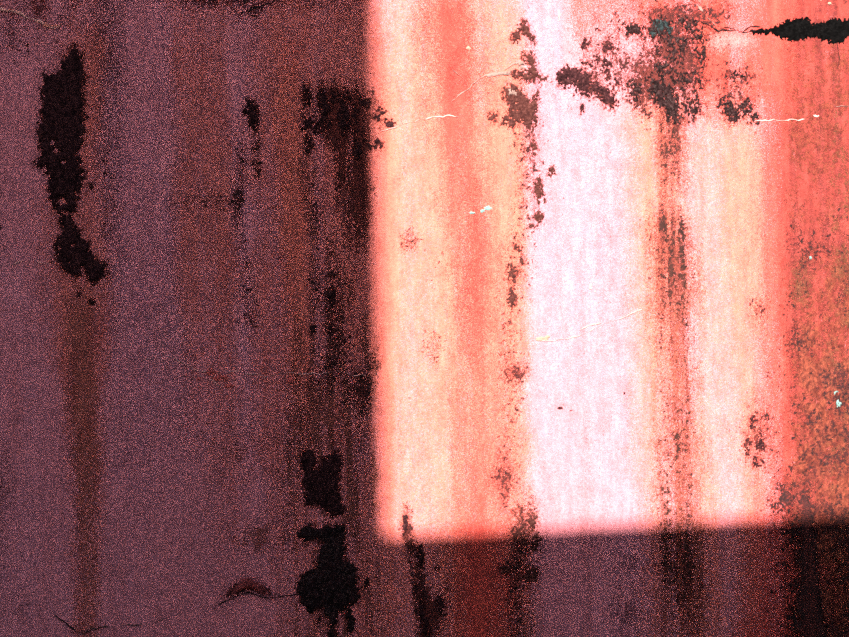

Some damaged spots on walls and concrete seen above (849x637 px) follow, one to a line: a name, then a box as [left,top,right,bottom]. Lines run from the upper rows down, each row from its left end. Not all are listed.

rust [31,0,125,637]
rust [159,0,545,637]
rust [561,0,849,637]
crack [696,0,761,33]
spalling [750,16,849,44]